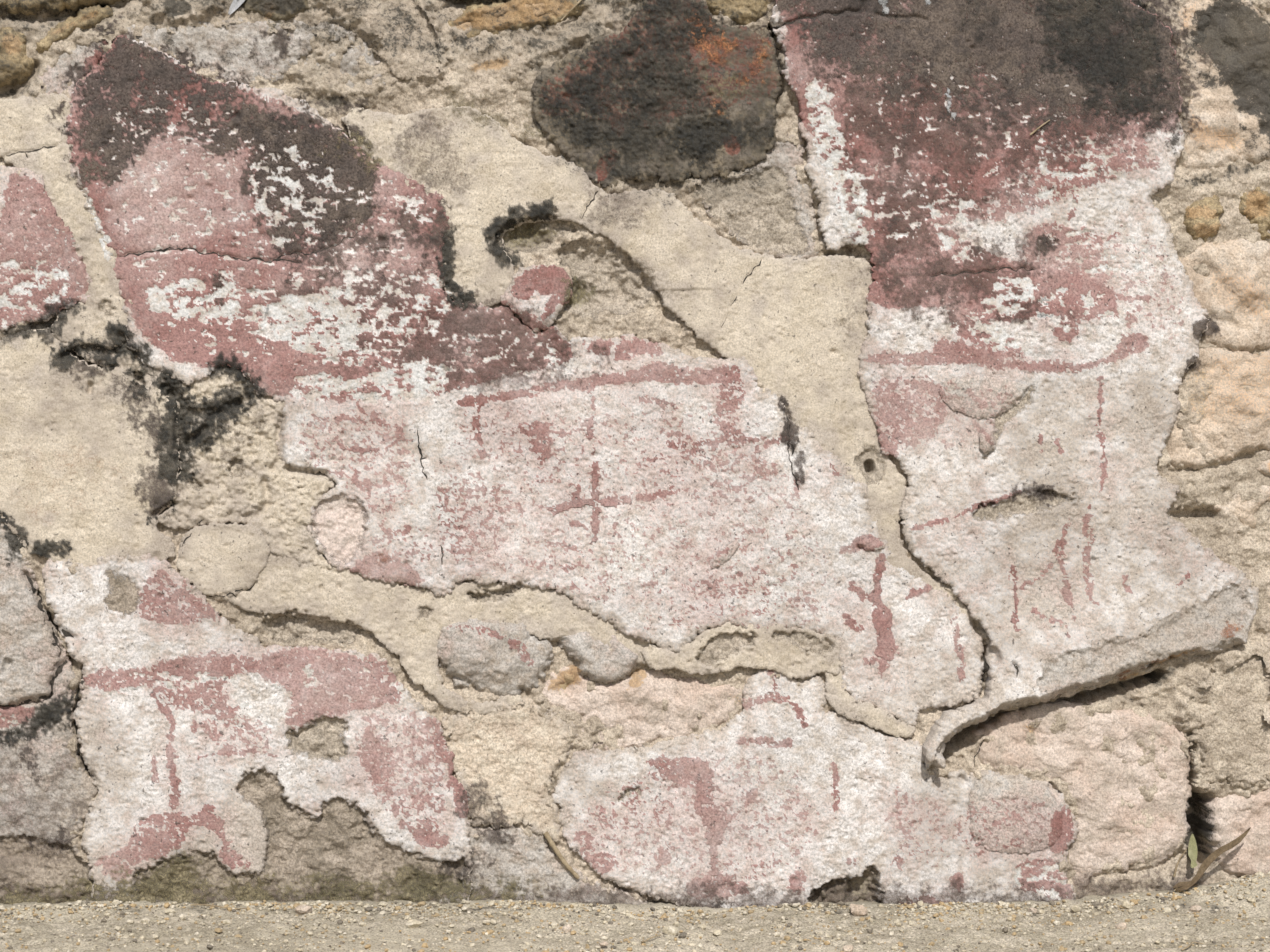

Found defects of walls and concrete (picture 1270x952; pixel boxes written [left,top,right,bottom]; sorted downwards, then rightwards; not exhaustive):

damp [537,0,774,183]
damp [756,0,1213,143]
peeling [805,80,871,246]
crack [111,230,362,263]
spalling [496,215,658,321]
spalling [854,444,887,484]
spalling [469,582,522,602]
crack [0,575,94,777]
spalling [262,611,364,644]
spalling [697,632,755,665]
crack [981,640,1019,690]
spalling [265,709,349,762]